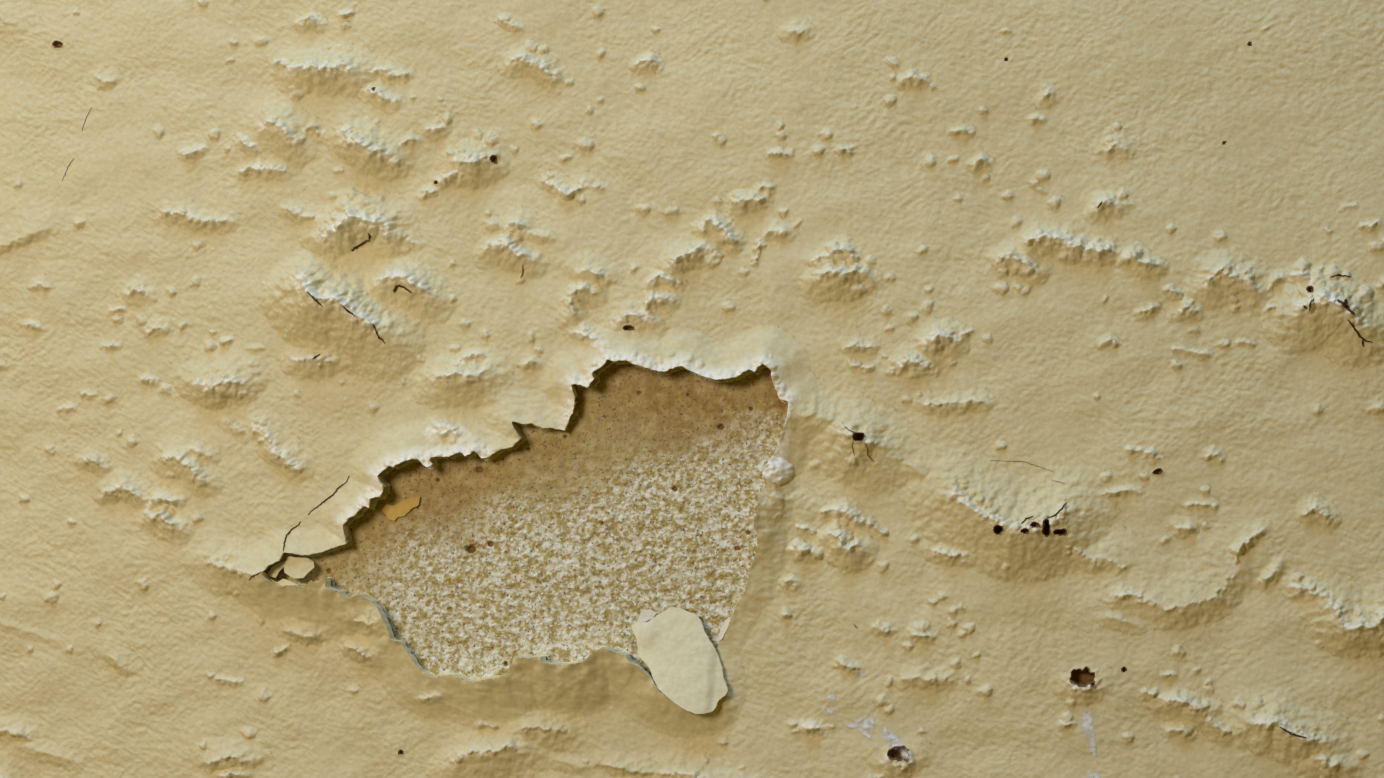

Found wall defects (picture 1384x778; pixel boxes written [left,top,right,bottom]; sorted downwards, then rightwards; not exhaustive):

peeling [246,325,823,738]